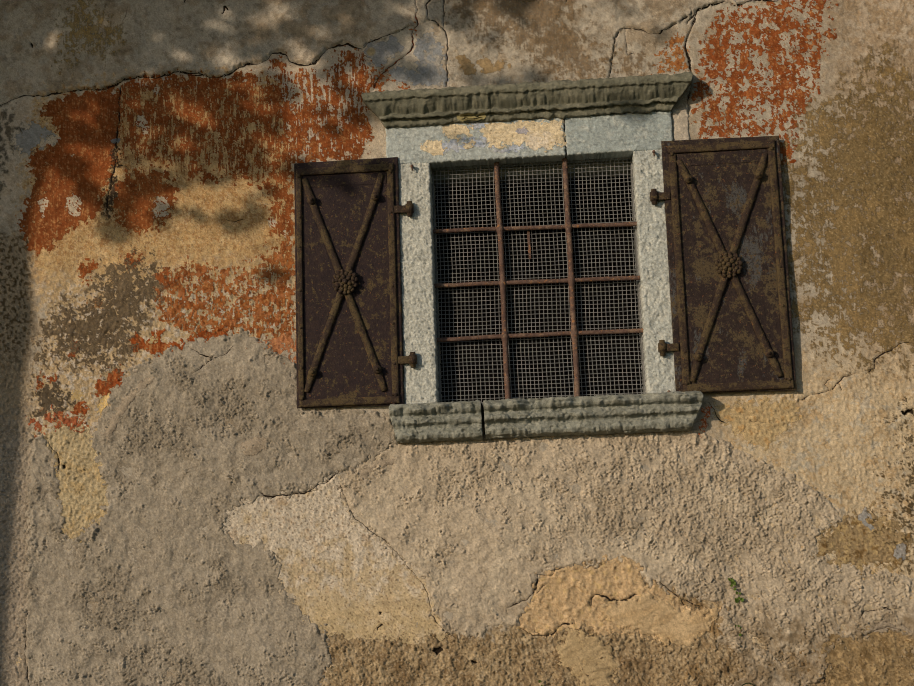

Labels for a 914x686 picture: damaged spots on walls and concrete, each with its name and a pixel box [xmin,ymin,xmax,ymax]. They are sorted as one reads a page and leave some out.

crack [0,0,448,213]
peeling [15,22,511,365]
peeling [420,112,567,156]
crack [608,0,775,113]
peeling [651,0,838,165]
water stain [780,40,914,380]
crack [801,342,909,400]
crack [261,473,454,637]
spalling [516,554,721,651]
water stain [866,397,914,575]